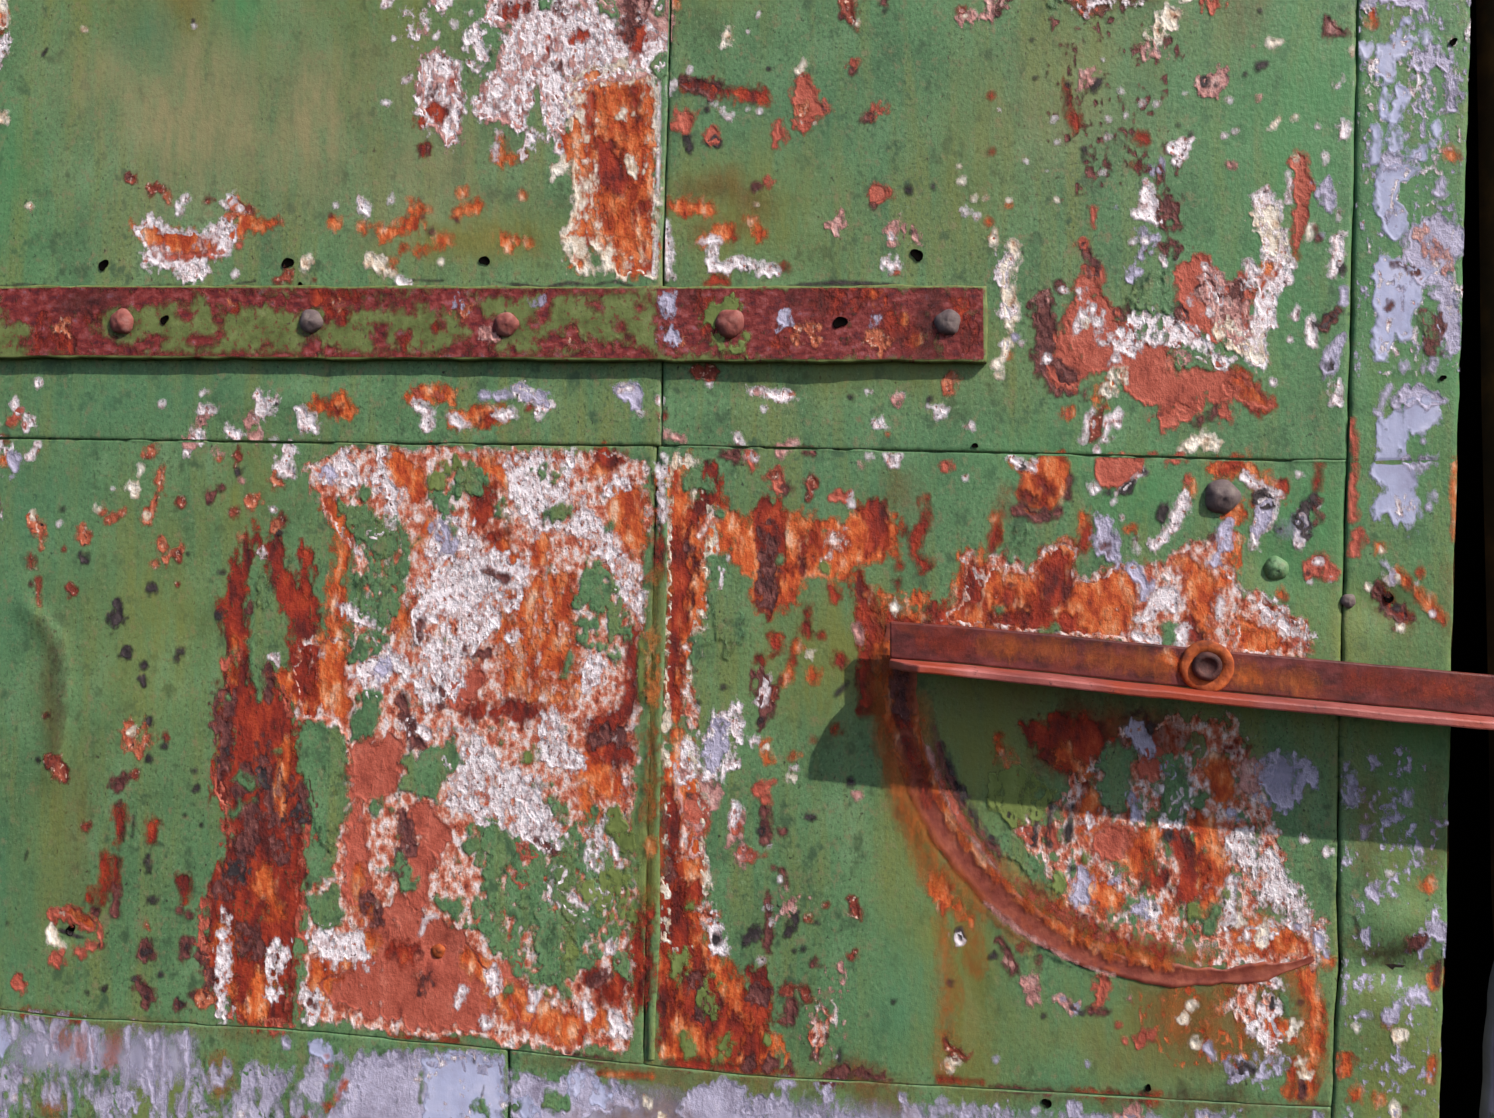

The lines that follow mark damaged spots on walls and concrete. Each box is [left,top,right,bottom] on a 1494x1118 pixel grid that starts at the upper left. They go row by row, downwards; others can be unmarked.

peeling [381,0,678,196]
spalling [771,59,831,149]
peeling [125,171,284,285]
corrosion [0,58,984,359]
peeling [955,0,1471,584]
peeling [1229,588,1318,658]
corrosion [86,800,126,918]
corrosion [147,819,160,844]
corrosion [175,519,337,1037]
peeling [0,382,1160,1118]
corrosion [637,452,1331,1111]
corrosion [394,1033,459,1043]